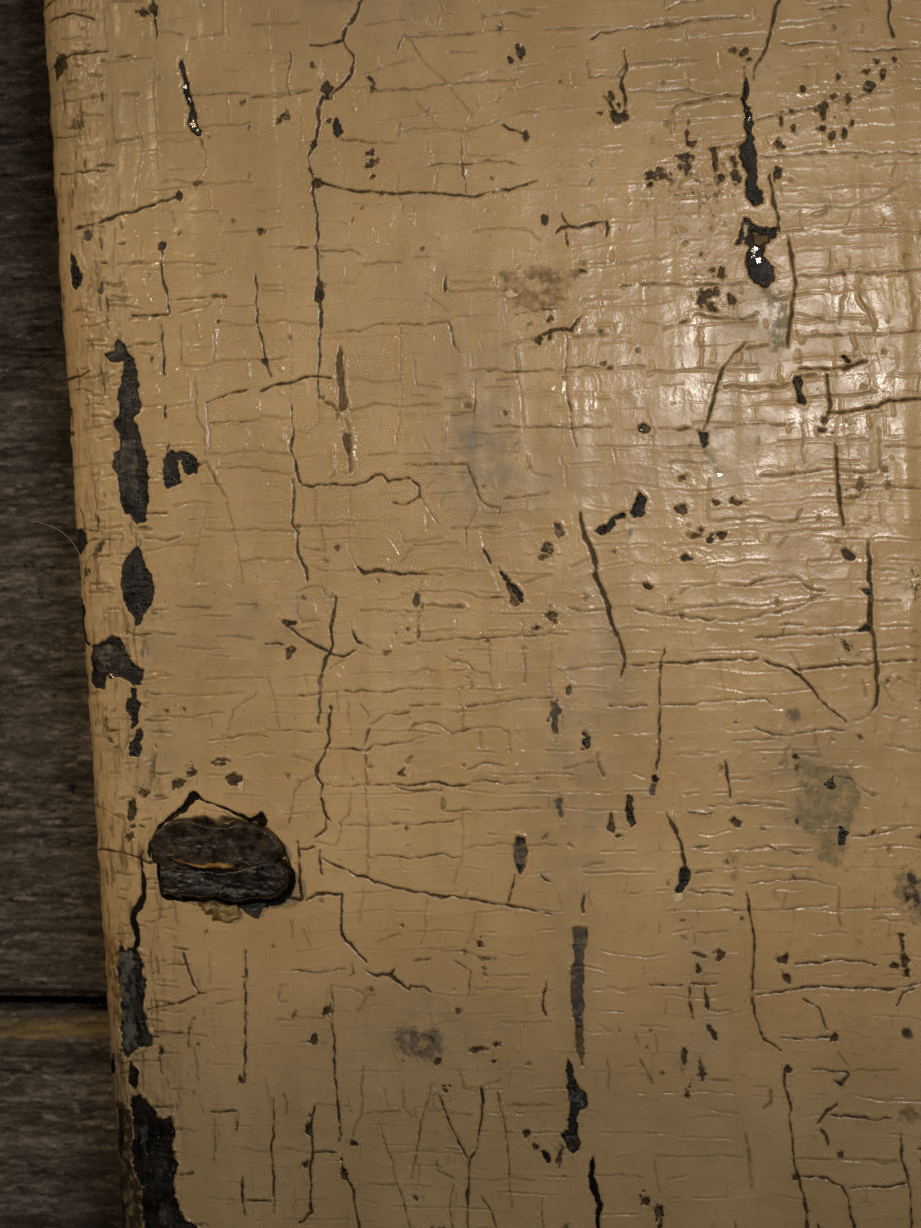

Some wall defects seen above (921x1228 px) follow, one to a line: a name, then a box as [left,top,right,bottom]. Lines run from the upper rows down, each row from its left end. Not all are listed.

crack [204,1,535,580]
crack [541,214,610,245]
peeling [710,46,778,288]
peeling [105,340,201,524]
peeling [90,636,144,756]
peeling [120,547,154,625]
rust [172,858,235,870]
crack [99,597,551,992]
crack [579,156,921,1228]
peeling [104,934,196,1228]
crack [299,996,360,1228]
peeling [522,1060,587,1166]